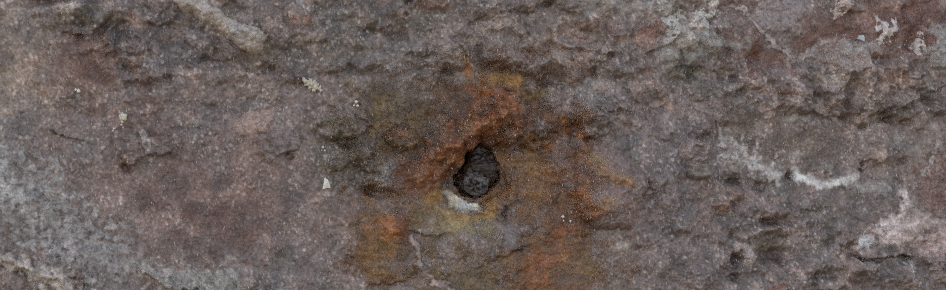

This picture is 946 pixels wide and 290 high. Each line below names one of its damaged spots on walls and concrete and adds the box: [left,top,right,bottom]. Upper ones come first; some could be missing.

rust [368,59,605,290]